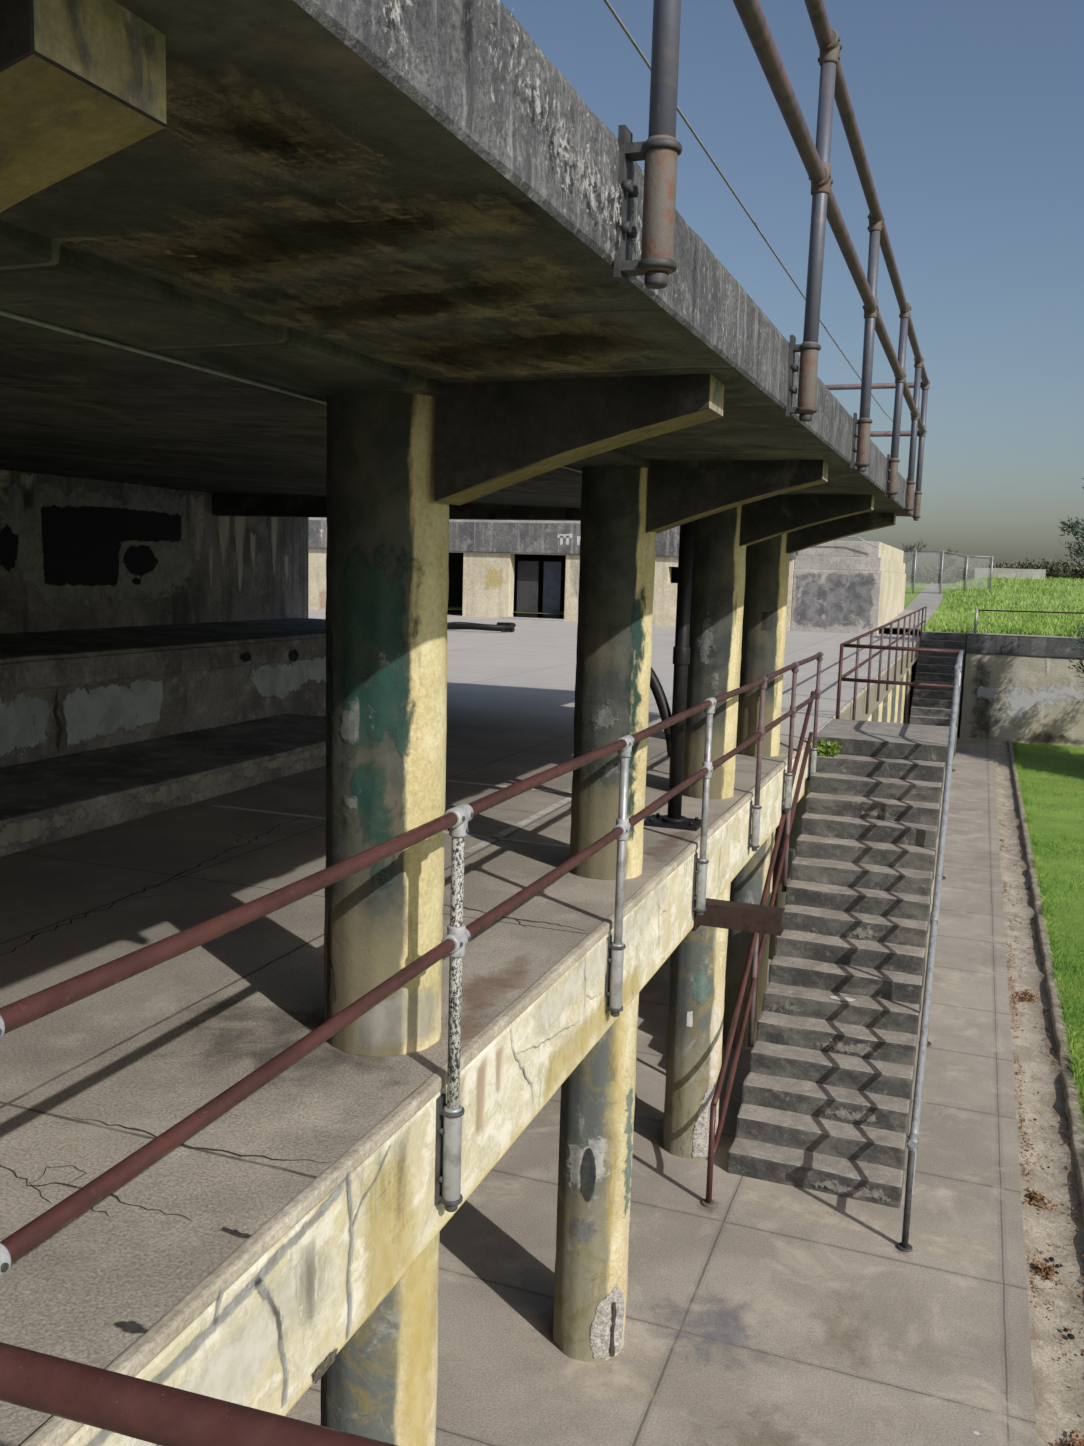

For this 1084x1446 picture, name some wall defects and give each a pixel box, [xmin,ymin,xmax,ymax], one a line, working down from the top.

damp [103,79,645,379]
peeling [0,677,164,757]
peeling [247,545,421,888]
spalling [686,971,719,1158]
crack [0,1165,192,1221]
peeling [563,1089,633,1218]
crack [77,1118,390,1407]
spalling [590,1285,624,1359]
crack [88,1430,114,1446]